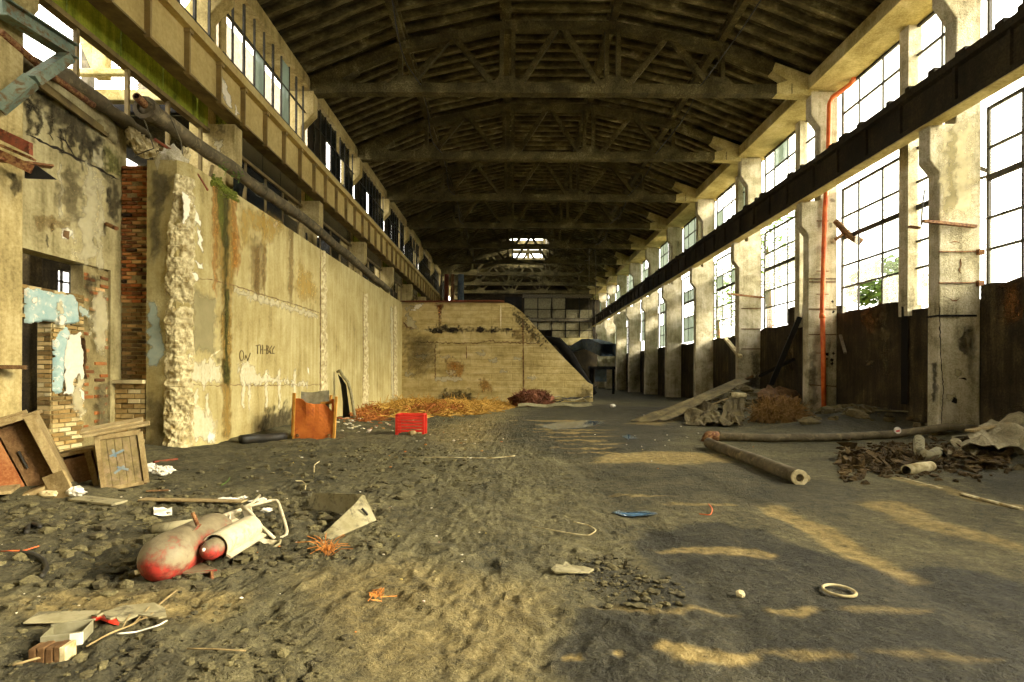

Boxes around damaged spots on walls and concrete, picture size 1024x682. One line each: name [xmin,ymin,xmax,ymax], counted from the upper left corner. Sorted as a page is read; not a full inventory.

leakage [24,90,121,268]
peeling [24,288,108,416]
spalling [162,173,203,448]
leakage [188,186,308,444]